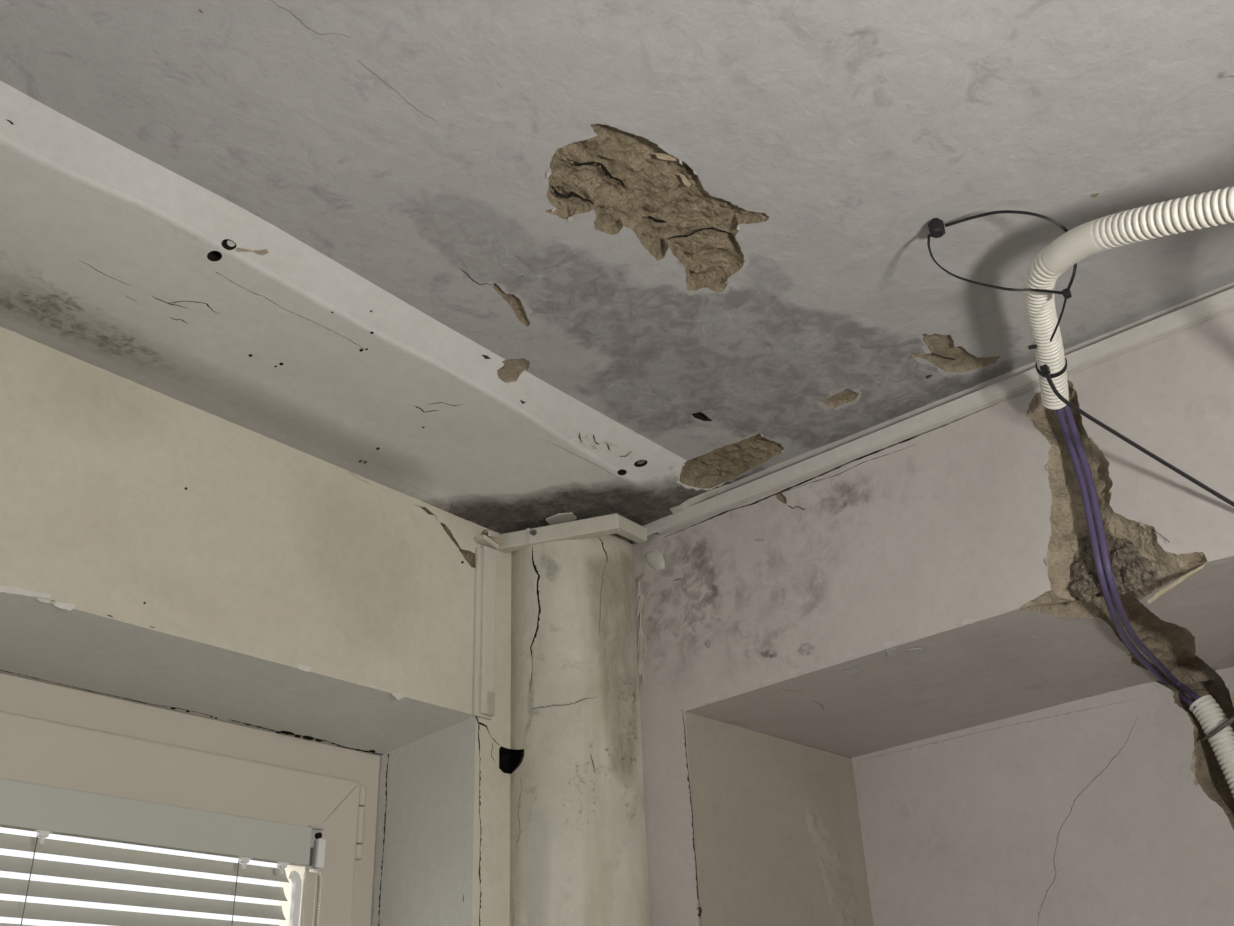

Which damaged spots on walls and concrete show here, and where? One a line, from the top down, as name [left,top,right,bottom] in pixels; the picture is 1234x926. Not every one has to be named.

crack [271,0,435,121]
flaking render [546,124,769,292]
flaking render [482,355,530,383]
water stain [532,257,969,446]
flaking render [906,333,1000,379]
flaking render [415,504,475,568]
water stain [444,477,746,534]
flaking render [679,433,784,489]
crack [528,548,595,711]
crack [599,538,608,641]
spalling [499,746,524,774]
crack [862,694,1153,920]